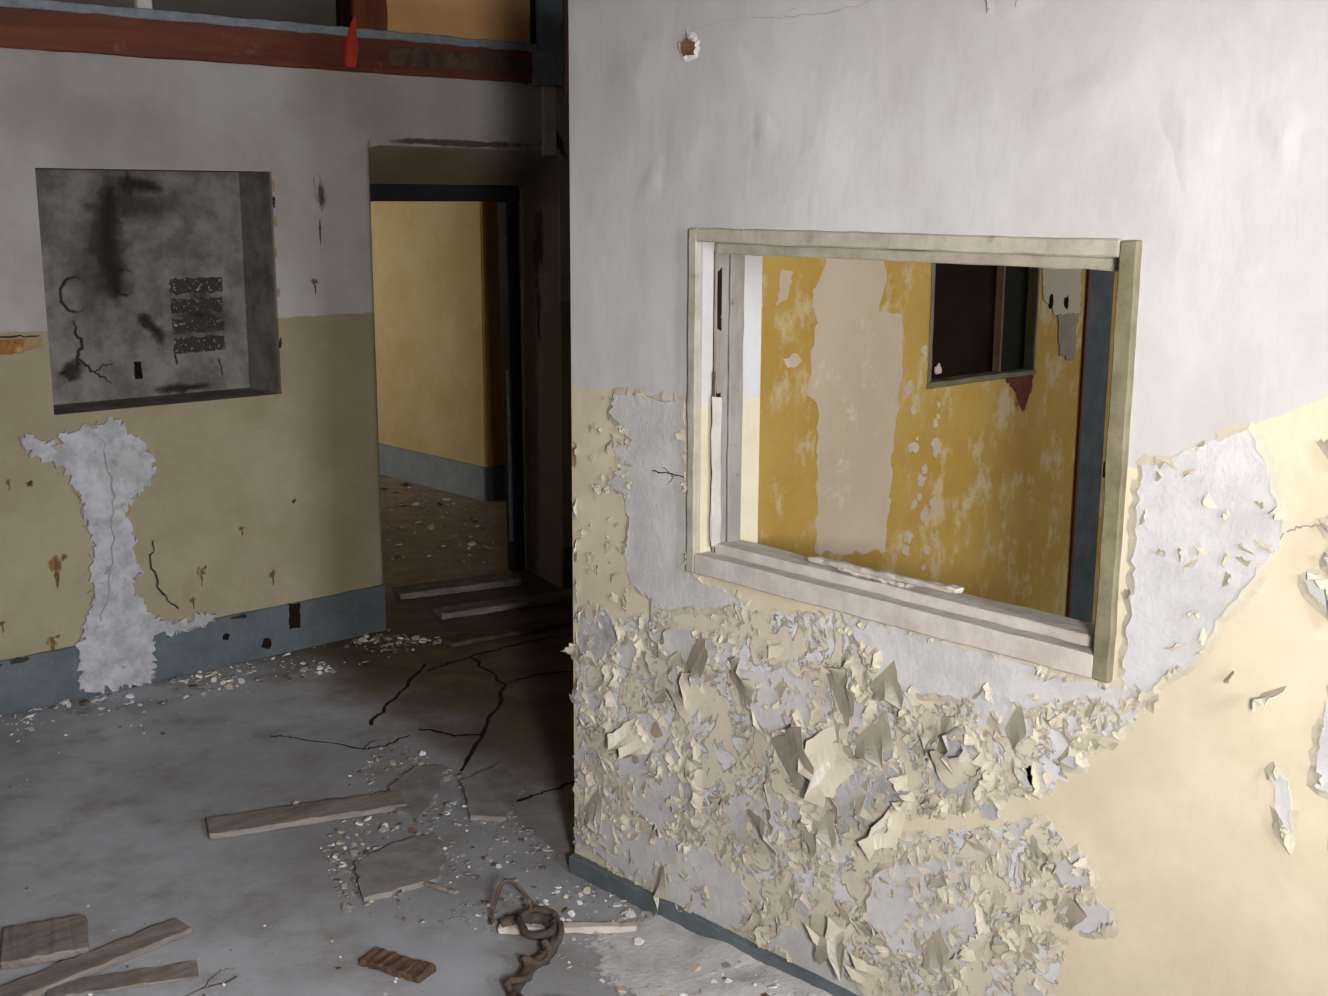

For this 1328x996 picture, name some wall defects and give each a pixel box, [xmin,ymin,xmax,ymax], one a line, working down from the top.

flaking render [678,31,701,62]
flaking render [0,335,46,356]
flaking render [783,258,942,570]
peeling [1315,440,1328,459]
rust [49,554,67,588]
crack [270,633,574,771]
peeling [563,387,1294,996]
peeling [1264,685,1328,856]
crack [516,781,574,802]